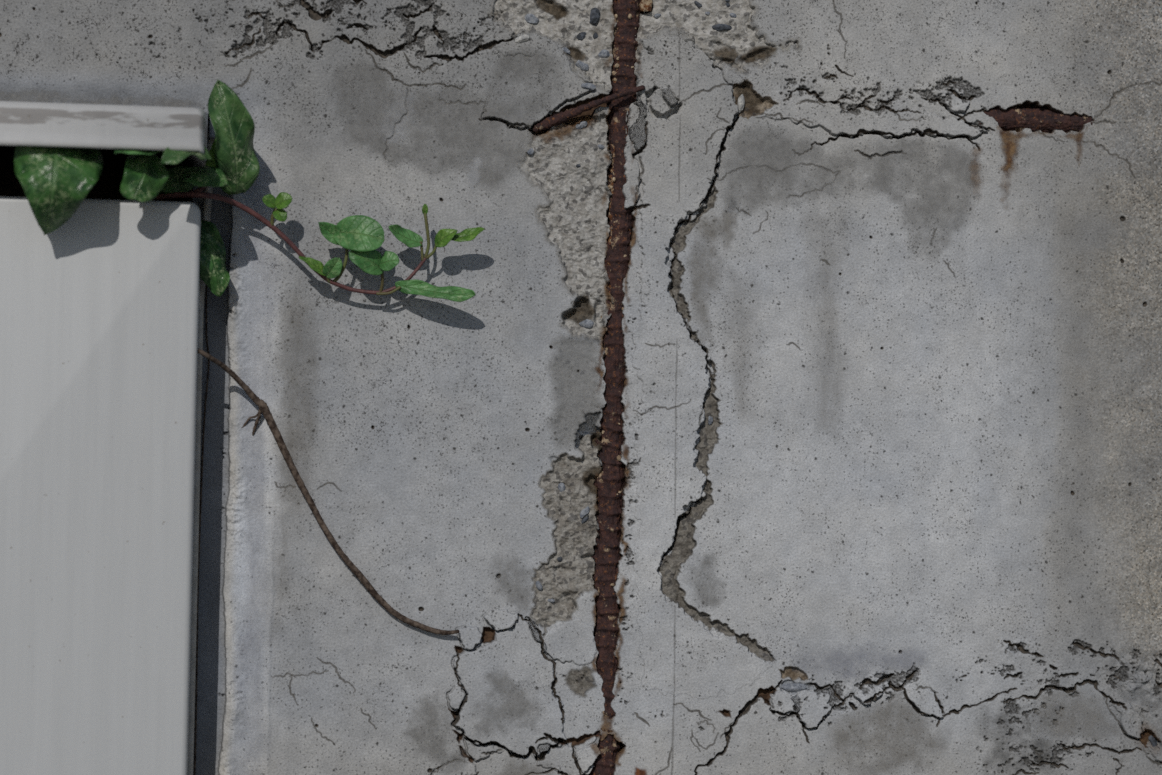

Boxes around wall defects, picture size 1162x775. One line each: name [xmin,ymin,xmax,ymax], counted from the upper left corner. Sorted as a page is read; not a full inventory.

crack [226,0,532,156]
spalling [490,0,647,341]
spalling [634,0,801,119]
corrosion [1000,131,1024,171]
corrosion [605,201,636,688]
crack [633,0,1162,775]
crack [435,614,582,775]
corrosion [592,713,626,775]